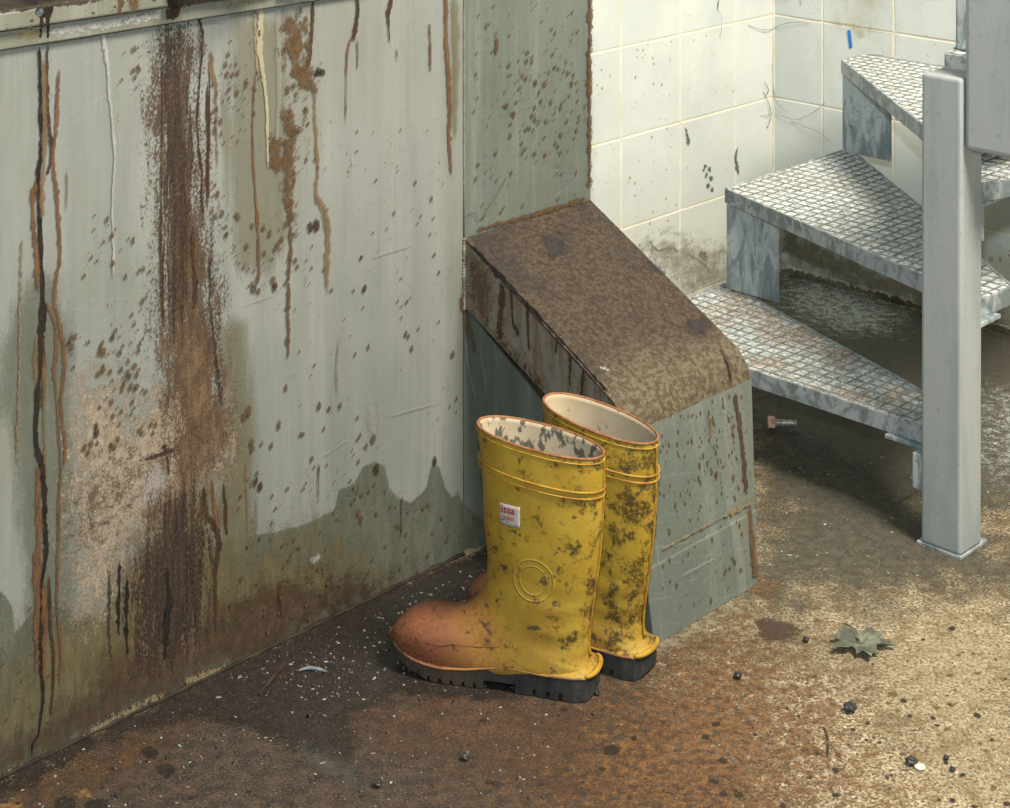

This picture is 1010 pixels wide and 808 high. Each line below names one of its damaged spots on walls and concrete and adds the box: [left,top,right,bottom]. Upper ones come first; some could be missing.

corrosion [32,0,349,714]
water stain [0,284,486,774]
corrosion [345,0,360,119]
corrosion [277,456,470,590]
corrosion [438,0,459,174]
corrosion [451,0,611,395]